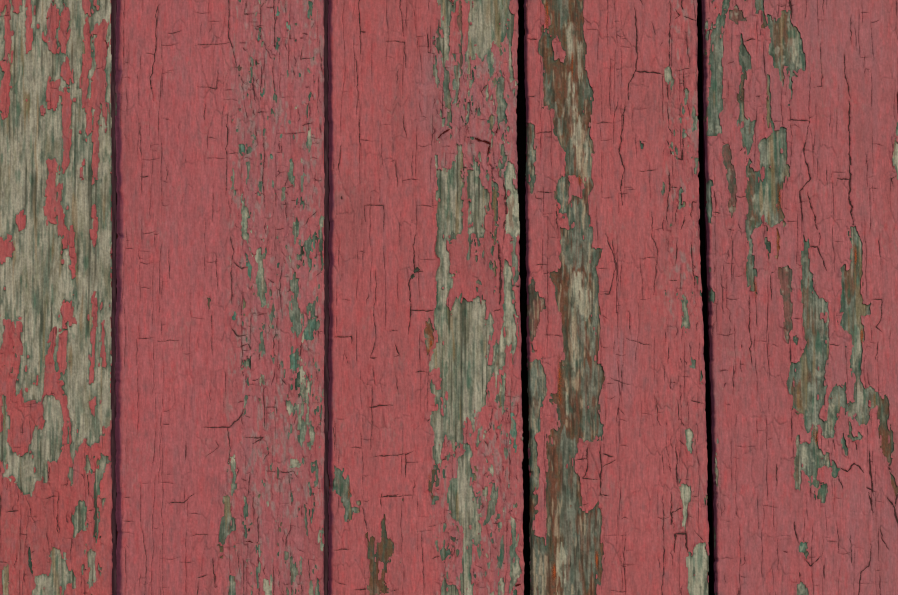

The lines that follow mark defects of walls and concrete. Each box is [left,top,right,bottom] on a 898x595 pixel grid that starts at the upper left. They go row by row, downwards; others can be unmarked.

peeling [0,0,117,595]
crack [148,0,323,223]
crack [201,378,310,595]
crack [300,235,433,526]
peeling [365,514,401,595]
crack [436,128,519,311]
peeling [424,0,605,595]
crack [578,445,615,496]
crack [601,0,720,295]
crack [626,317,703,595]
peeling [664,0,898,503]
crack [789,18,854,271]